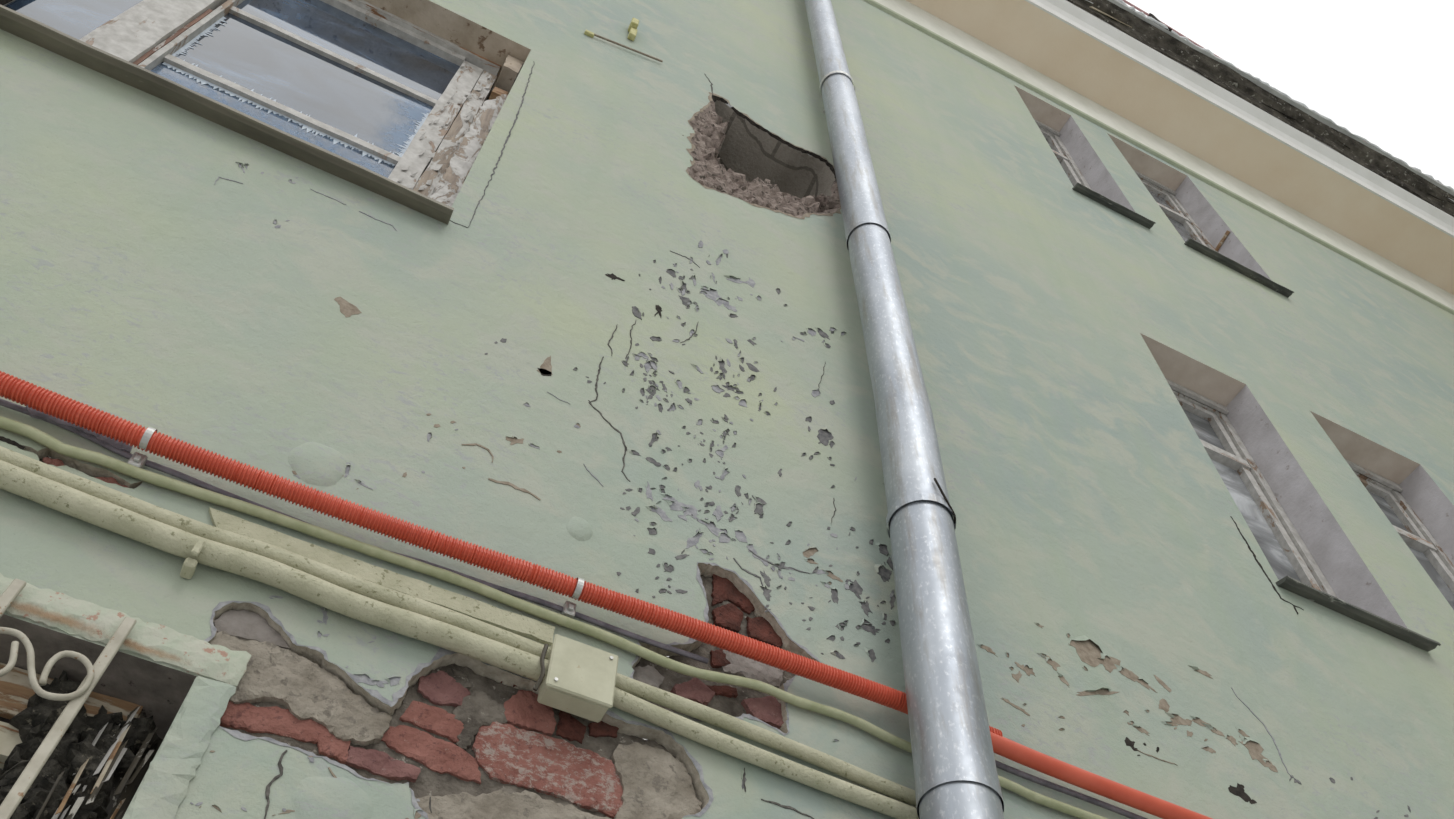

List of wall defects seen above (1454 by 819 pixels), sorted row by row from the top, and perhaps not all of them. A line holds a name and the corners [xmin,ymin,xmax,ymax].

spalling [683,92,841,219]
spalling [334,296,362,317]
peeling [343,462,373,490]
flaking render [488,478,541,500]
peeling [505,436,562,453]
spalling [537,356,553,376]
crack [548,321,636,487]
spalling [573,241,896,663]
crack [1230,516,1304,614]
spalling [204,596,796,819]
peeling [976,633,1302,785]
spalling [1228,783,1257,804]